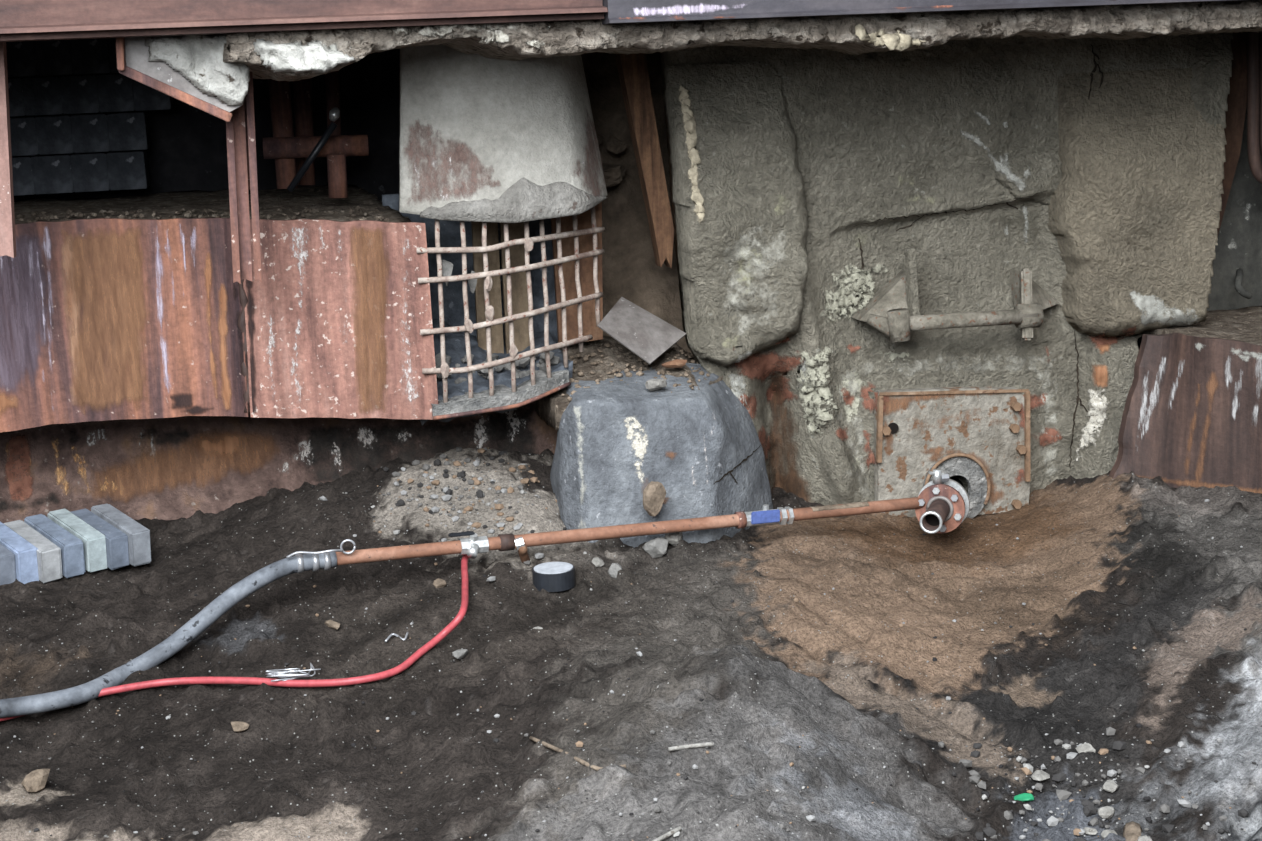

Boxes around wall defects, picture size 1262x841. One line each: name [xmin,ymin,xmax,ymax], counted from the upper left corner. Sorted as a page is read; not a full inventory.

crack [853,191,1046,304]
rust [63,238,81,397]
rust [205,253,231,409]
rust [351,228,389,411]
water stain [730,352,752,411]
rust [733,337,808,502]
rust [841,384,951,468]
rust [1089,326,1136,387]
rust [1149,374,1262,494]